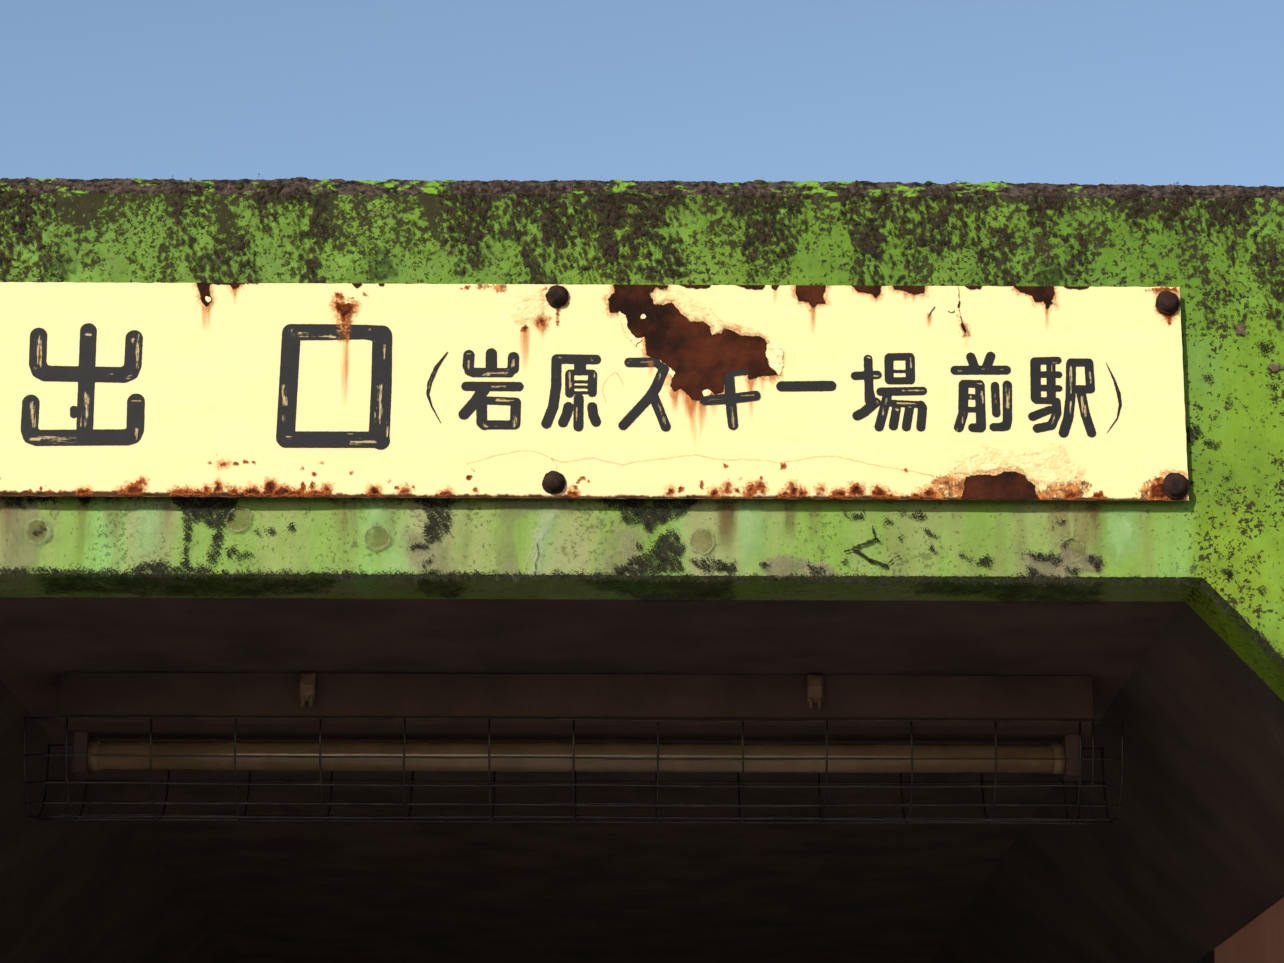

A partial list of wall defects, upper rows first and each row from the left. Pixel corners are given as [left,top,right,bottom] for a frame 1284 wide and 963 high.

water stain [0,180,55,282]
water stain [169,174,339,283]
water stain [435,180,689,285]
water stain [724,182,810,283]
water stain [836,180,1095,287]
water stain [0,497,1284,669]
crack [844,526,900,567]